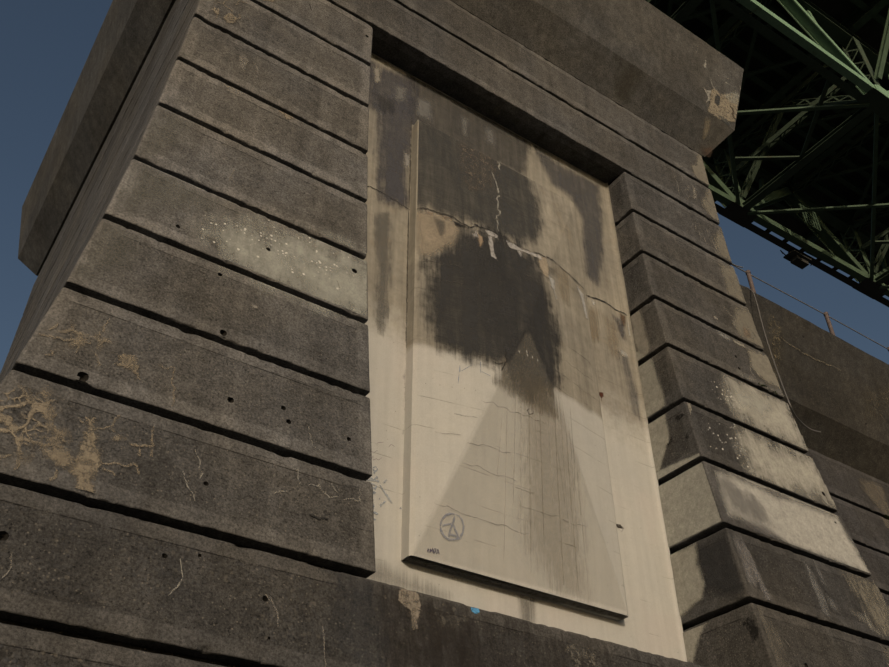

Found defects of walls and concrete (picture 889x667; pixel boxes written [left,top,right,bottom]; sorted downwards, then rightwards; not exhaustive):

damp [369,63,431,207]
spalling [704,82,741,122]
crack [367,117,625,344]
damp [416,213,561,417]
peeling [398,588,421,628]